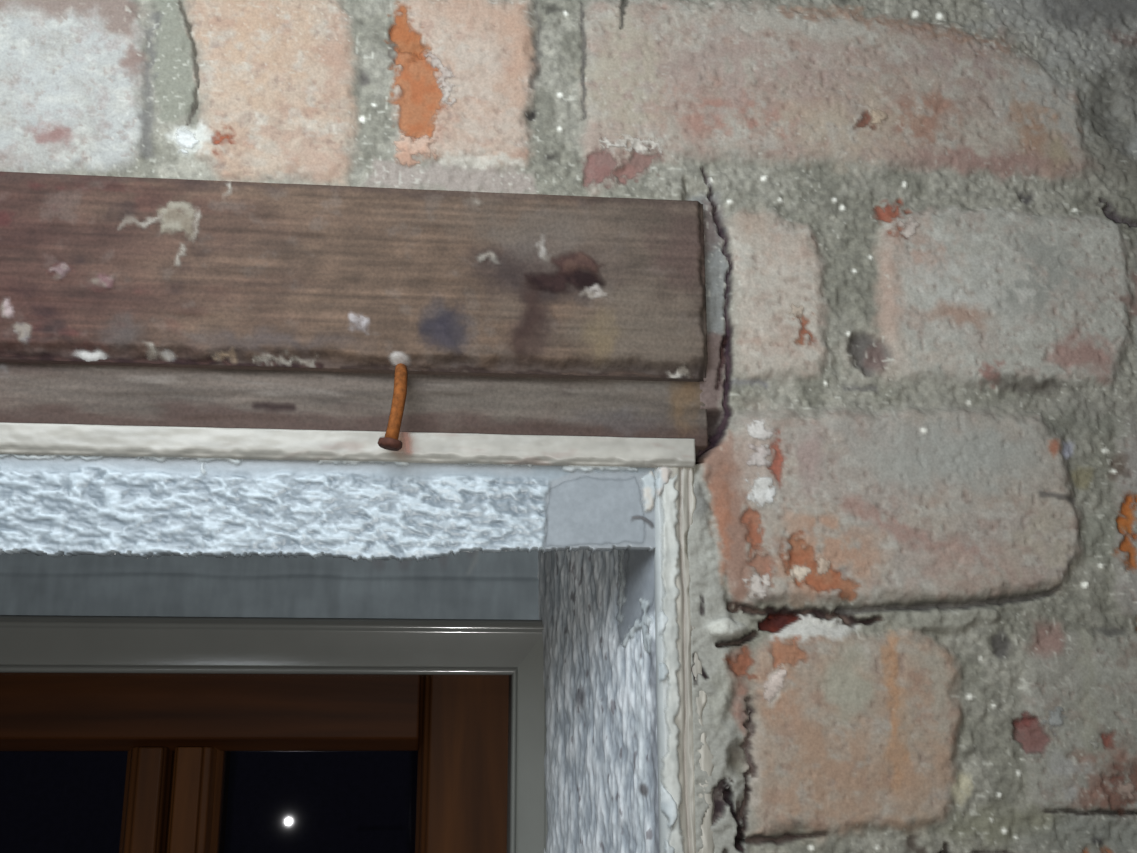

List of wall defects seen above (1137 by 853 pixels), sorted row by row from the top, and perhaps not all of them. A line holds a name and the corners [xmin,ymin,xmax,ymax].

spalling [388,6,456,166]
crack [1100,200,1137,227]
crack [0,170,732,457]
spalling [741,420,859,601]
spalling [1116,495,1137,568]
crack [691,589,1057,681]
crack [712,698,825,853]
crack [939,844,1010,853]
crack [1045,808,1137,816]